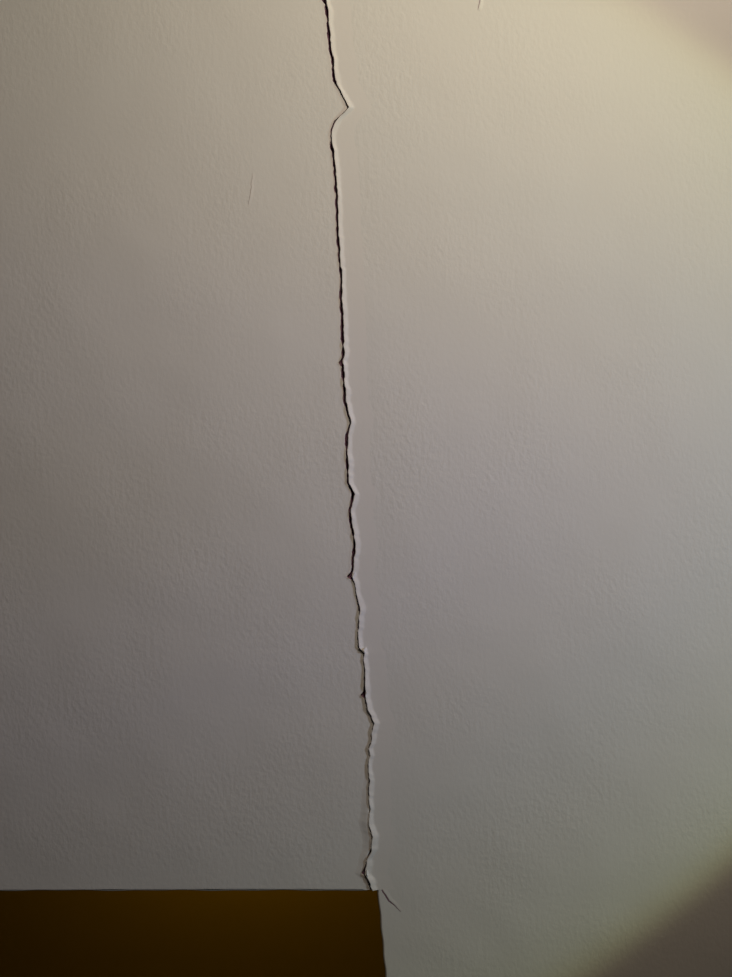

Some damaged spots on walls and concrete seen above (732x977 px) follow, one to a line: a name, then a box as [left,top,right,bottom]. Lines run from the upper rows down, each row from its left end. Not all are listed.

crack [319,0,403,912]